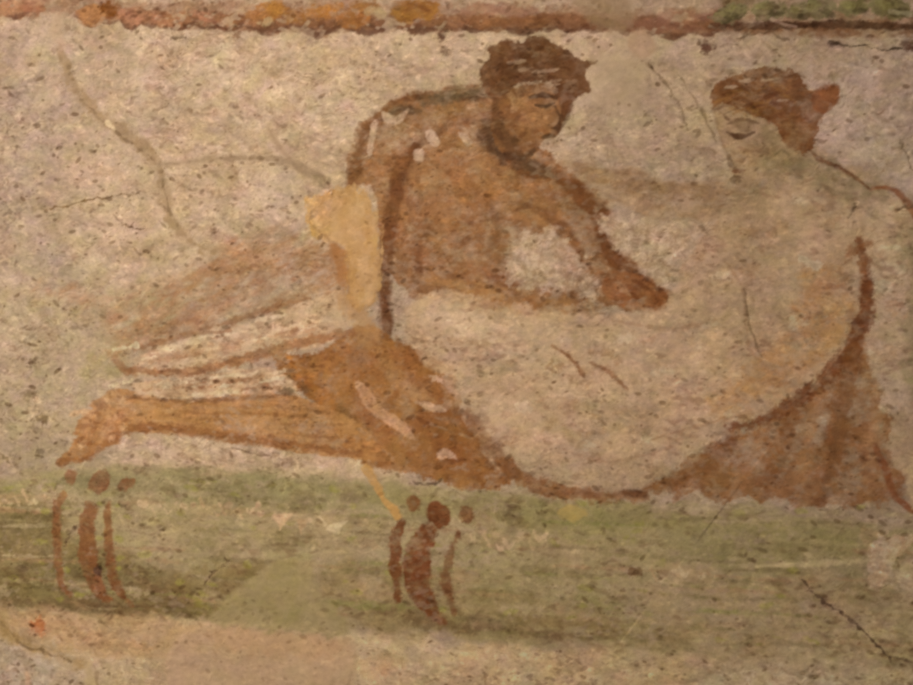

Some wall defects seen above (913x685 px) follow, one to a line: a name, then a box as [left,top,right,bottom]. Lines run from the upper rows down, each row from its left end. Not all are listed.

crack [41,11,325,257]
crack [799,575,913,665]